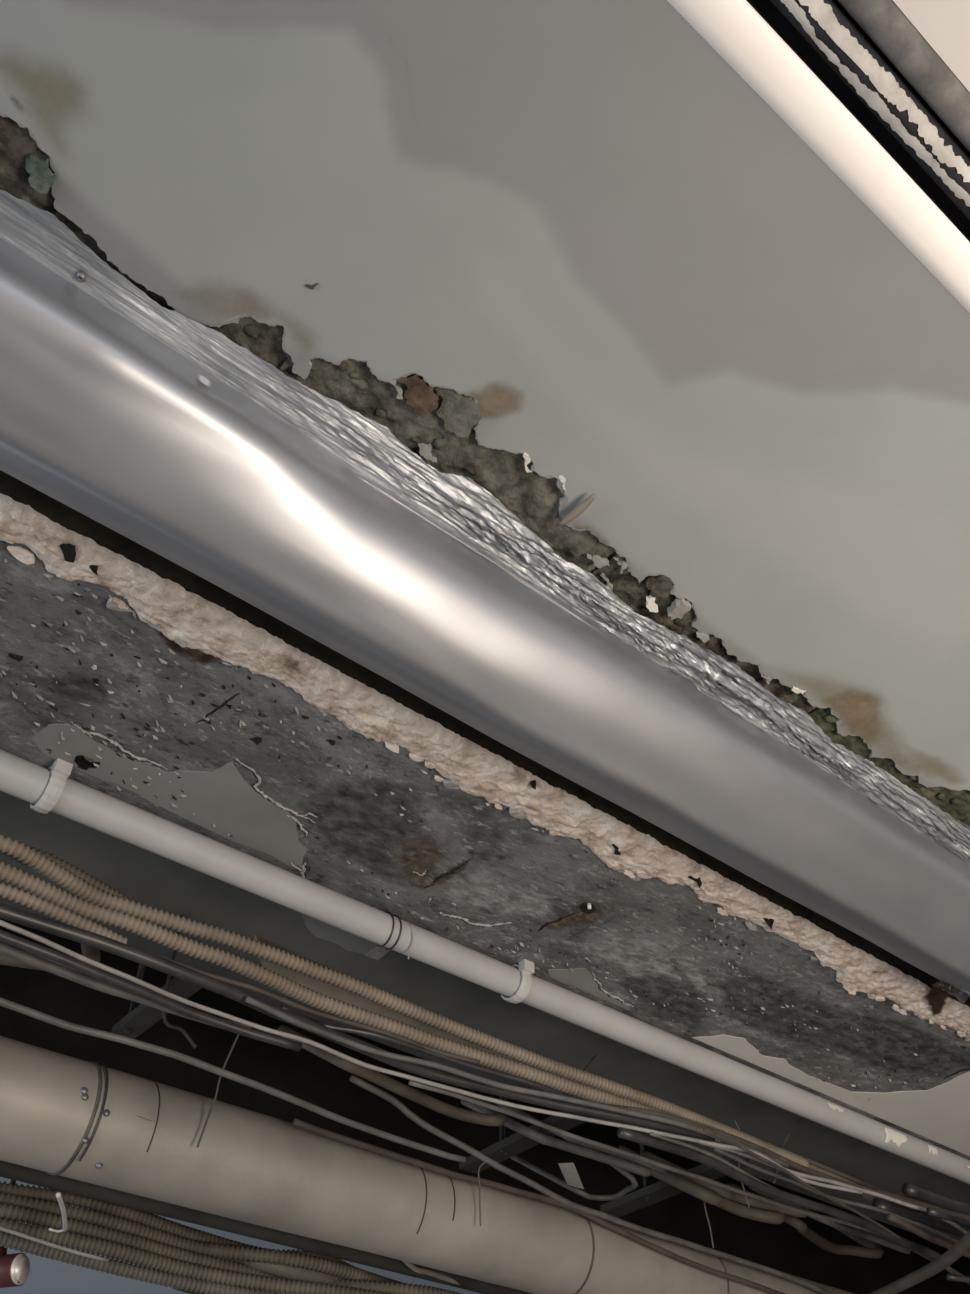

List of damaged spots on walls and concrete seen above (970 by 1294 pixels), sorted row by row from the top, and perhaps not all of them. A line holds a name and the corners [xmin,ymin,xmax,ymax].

peeling [781,0,970,207]
spalling [0,116,67,223]
spalling [142,287,175,311]
damp [472,387,516,415]
spalling [200,316,970,826]
damp [123,676,166,721]
damp [817,686,889,745]
spalling [0,493,970,1156]